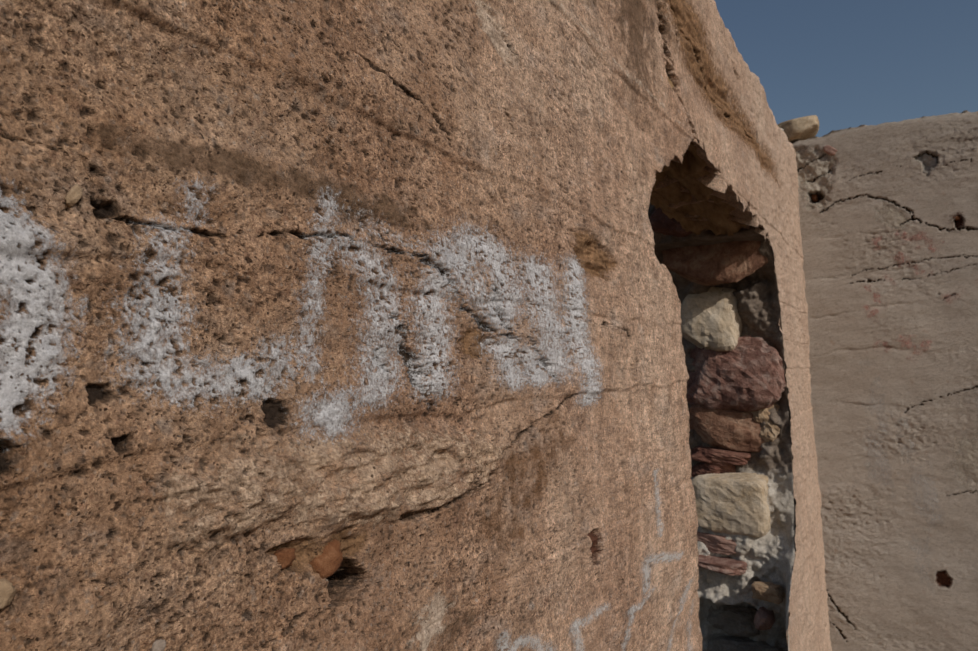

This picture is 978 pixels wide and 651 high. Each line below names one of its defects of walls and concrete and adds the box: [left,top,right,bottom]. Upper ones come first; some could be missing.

crack [366,60,448,135]
spalling [914,151,938,176]
crack [820,166,978,231]
crack [854,256,974,283]
crack [905,386,978,413]
crack [503,394,578,453]
crack [399,473,491,520]